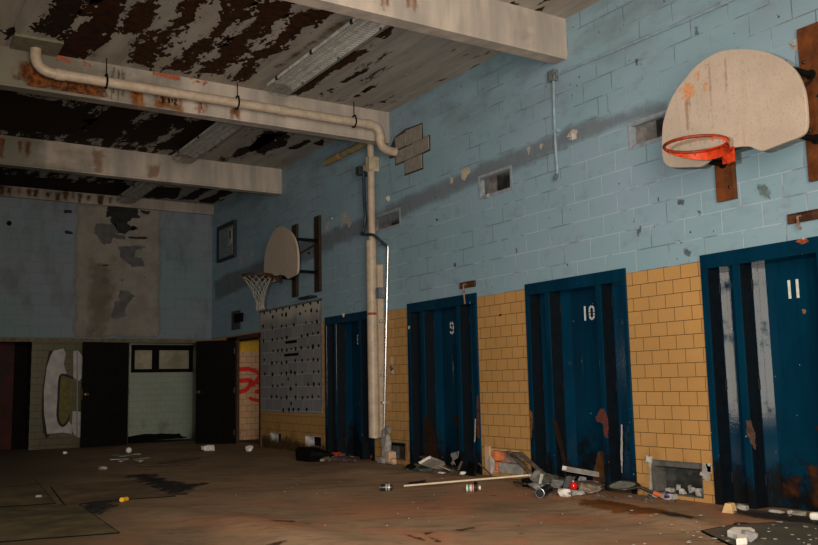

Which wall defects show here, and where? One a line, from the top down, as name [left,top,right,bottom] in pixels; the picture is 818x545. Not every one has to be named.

peeling [29,0,335,85]
rust [15,62,106,97]
peeling [0,89,217,151]
rust [595,408,609,438]
rust [746,420,756,450]
rust [783,466,818,506]